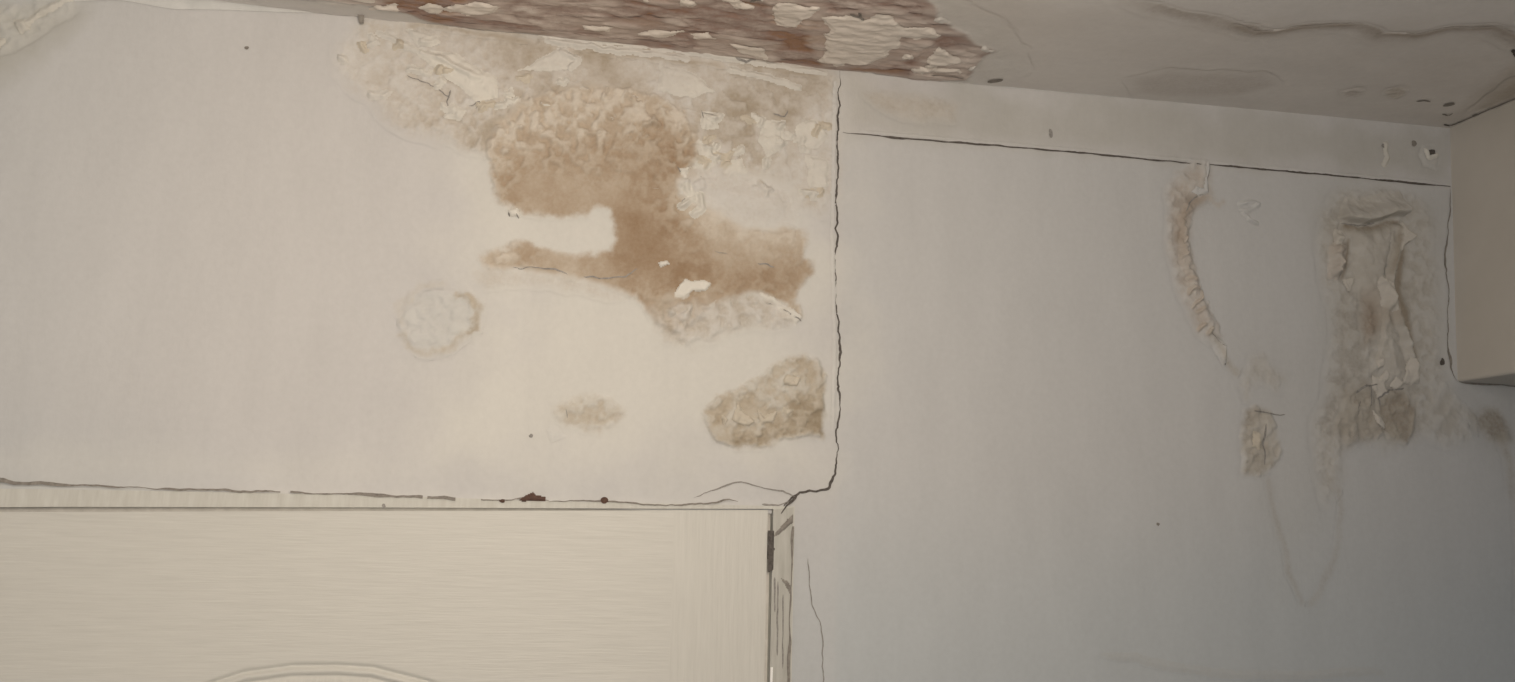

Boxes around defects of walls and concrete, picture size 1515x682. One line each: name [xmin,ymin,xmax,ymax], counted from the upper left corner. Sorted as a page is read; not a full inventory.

damp [469,82,817,355]
flaking render [253,0,1035,222]
peeling [1161,158,1242,380]
crack [0,478,456,508]
damp [529,387,630,443]
damp [699,351,829,454]
crack [481,79,1515,682]